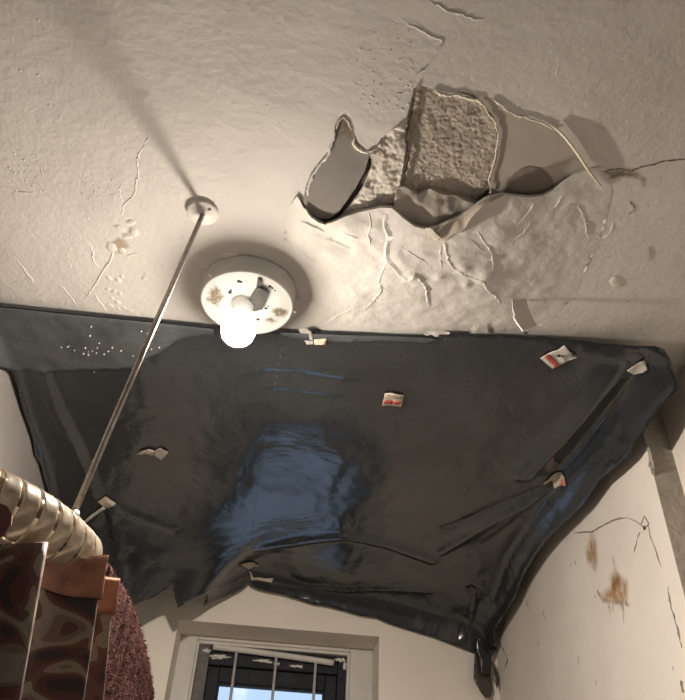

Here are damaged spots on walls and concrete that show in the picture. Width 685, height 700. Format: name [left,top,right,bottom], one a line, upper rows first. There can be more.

crack [119,130,150,215]
flaking render [303,86,603,247]
crack [604,159,685,173]
crack [60,242,142,313]
crack [300,213,501,327]
crack [575,517,640,533]
rust [606,576,626,601]